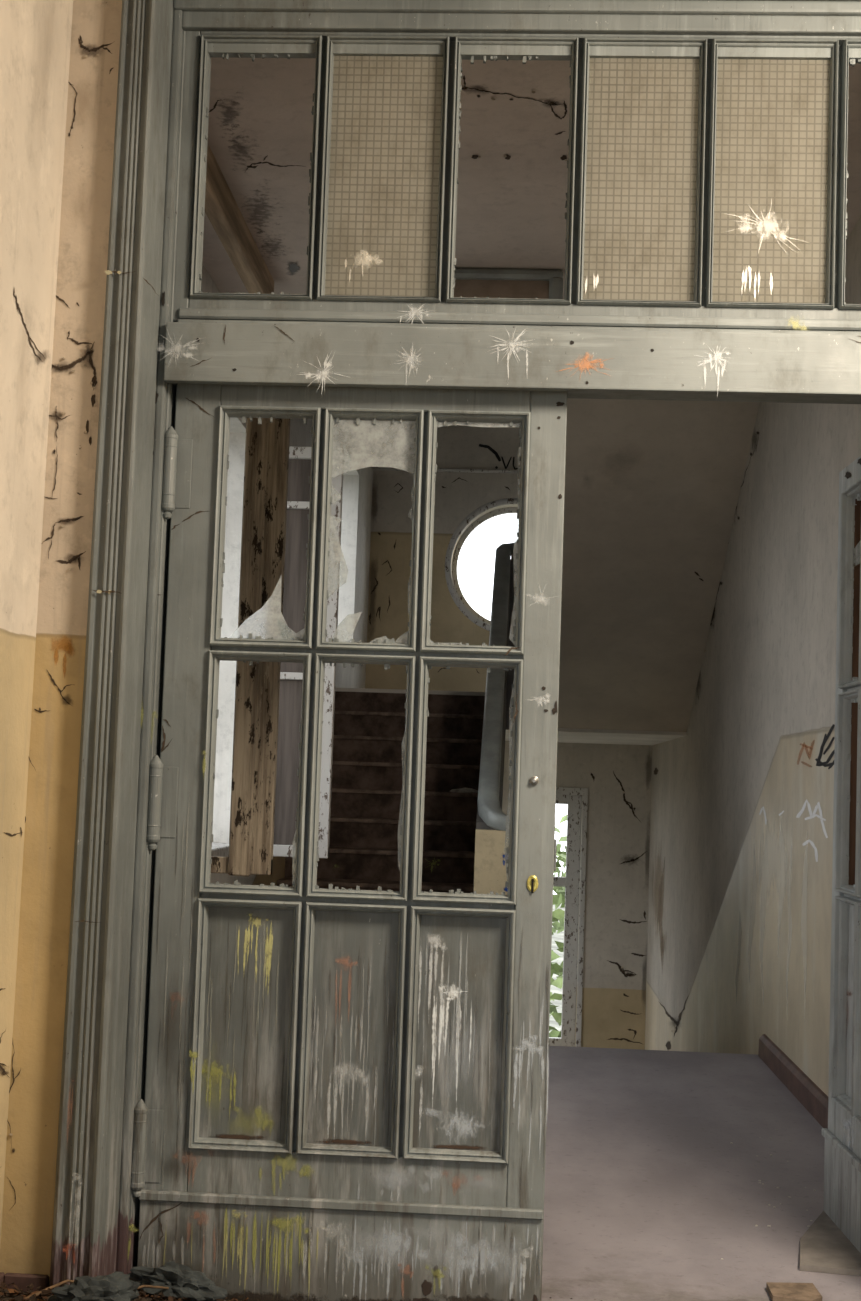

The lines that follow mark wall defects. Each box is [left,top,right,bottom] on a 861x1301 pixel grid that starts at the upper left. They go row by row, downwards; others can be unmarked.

crack [462,75,567,135]
crack [13,288,97,390]
crack [41,406,122,594]
crack [591,771,646,864]
crack [0,1030,21,1206]